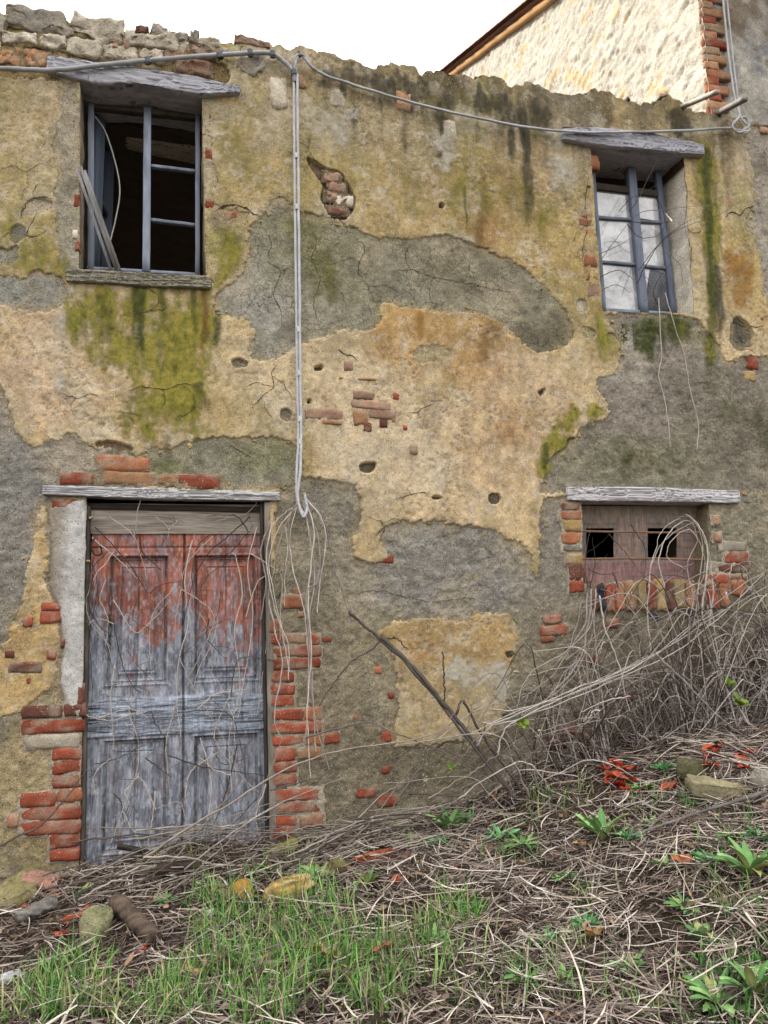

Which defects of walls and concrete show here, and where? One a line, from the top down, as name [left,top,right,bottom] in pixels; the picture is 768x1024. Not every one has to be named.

crack [1,163,52,239]
leakage [132,287,147,350]
flaking render [330,89,359,122]
crack [215,204,514,330]
spalling [169,104,601,368]
flaking render [396,91,412,113]
leakage [474,84,576,213]
leakage [697,148,753,330]
crack [246,359,292,416]
spalling [0,312,768,884]